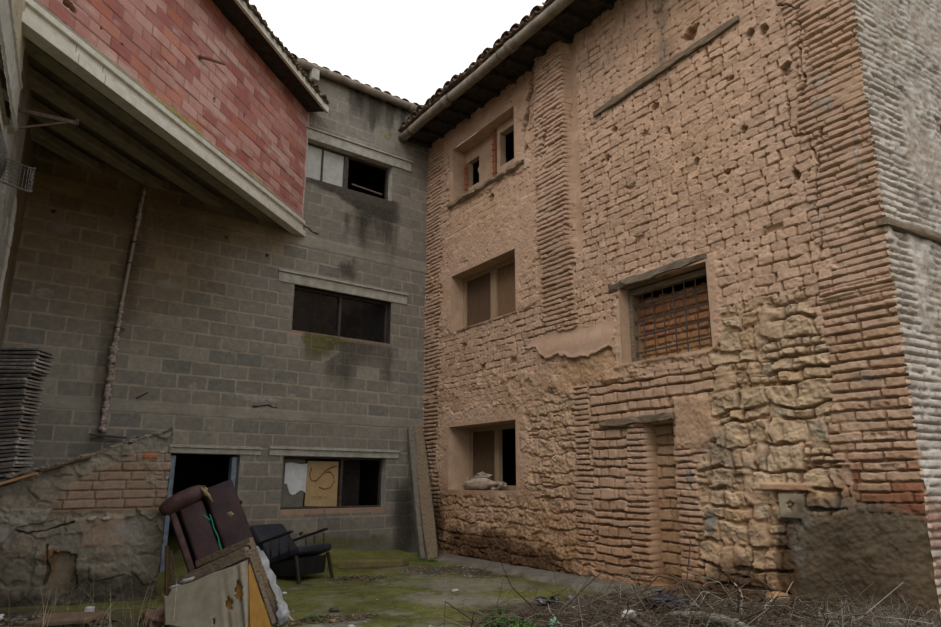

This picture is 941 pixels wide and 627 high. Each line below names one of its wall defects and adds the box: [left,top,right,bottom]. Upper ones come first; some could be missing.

crack [777,2,827,258]
flaking render [525,317,616,359]
spalling [44,551,78,593]